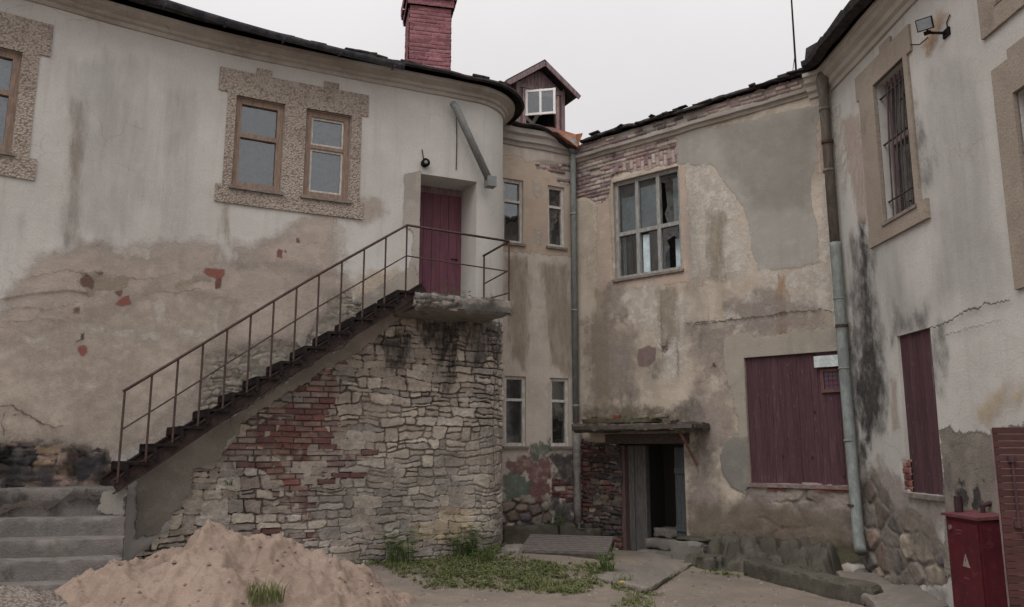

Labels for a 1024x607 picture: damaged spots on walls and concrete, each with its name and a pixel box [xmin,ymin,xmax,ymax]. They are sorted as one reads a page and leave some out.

peeling [815,105,868,223]
crack [0,405,62,435]
peeling [0,170,491,488]
spalling [135,313,402,539]
damp [374,259,527,393]
crack [660,287,832,374]
flaking render [502,138,1024,588]
damp [849,220,941,526]
crack [929,299,1010,338]